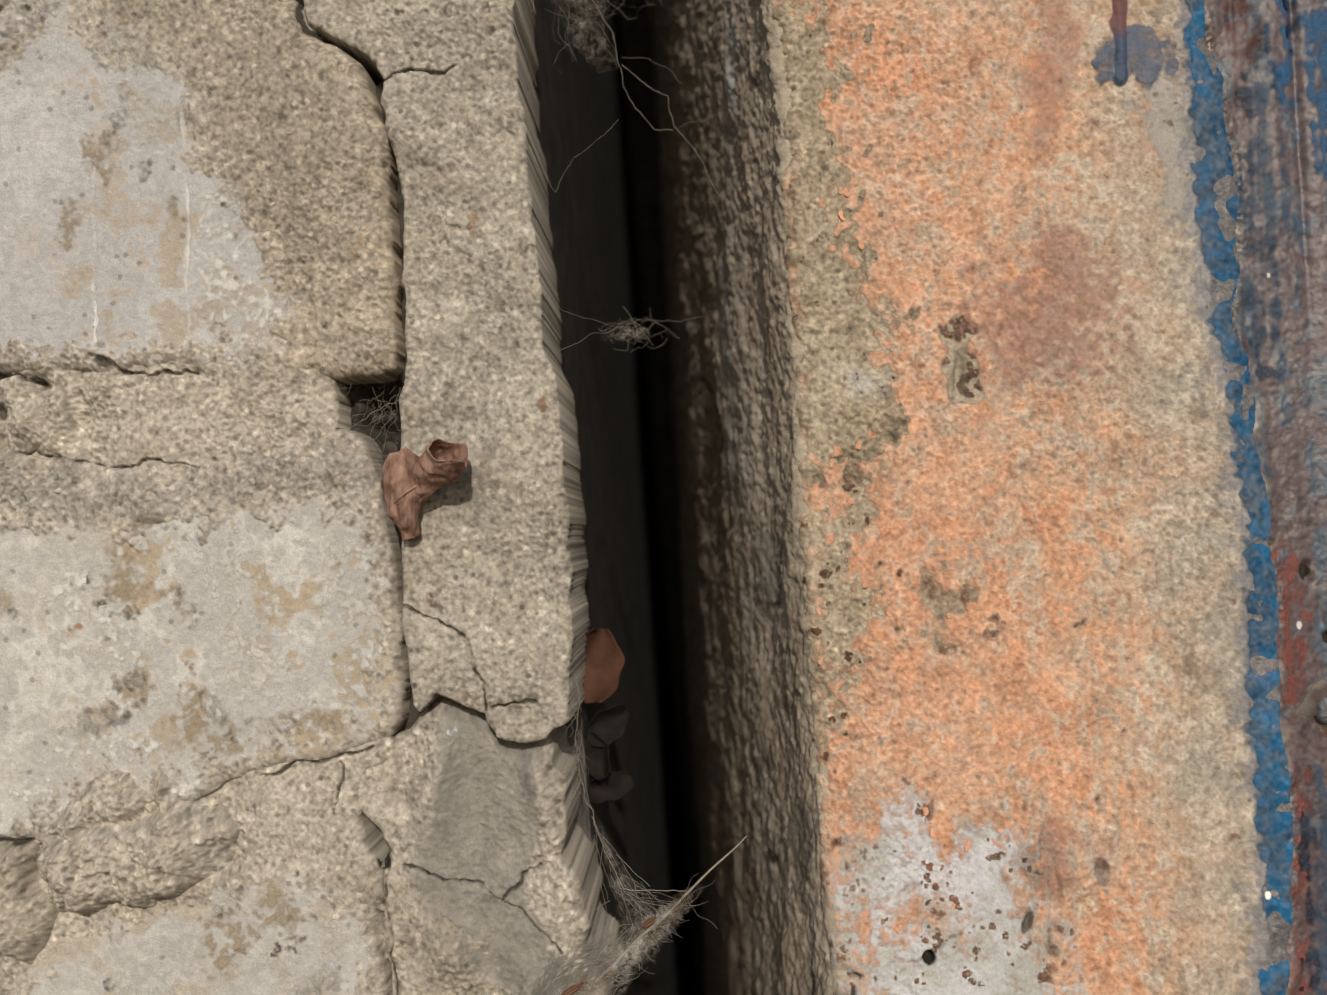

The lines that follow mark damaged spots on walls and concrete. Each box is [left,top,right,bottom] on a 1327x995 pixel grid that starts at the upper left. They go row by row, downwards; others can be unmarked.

crack [295,0,321,40]
crack [376,66,454,124]
peeling [1238,0,1327,260]
crack [396,173,407,384]
peeling [773,0,920,761]
peeling [939,313,985,404]
crack [407,607,536,710]
peeling [913,554,979,655]
corrosion [1270,549,1312,704]
crack [272,687,426,796]
peeling [822,781,1084,995]
corrosion [1291,797,1319,995]